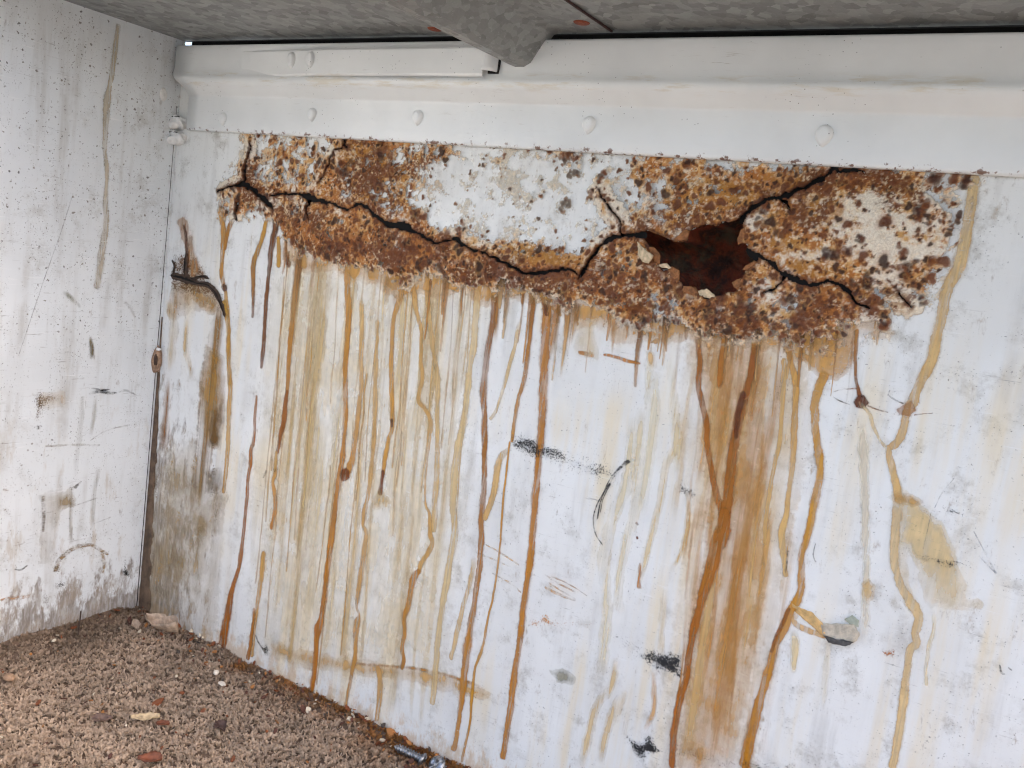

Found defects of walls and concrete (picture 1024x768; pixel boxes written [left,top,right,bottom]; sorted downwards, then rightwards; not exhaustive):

leakage [102,28,118,195]
crack [157,145,226,345]
crack [217,143,647,277]
spalling [645,219,757,299]
crack [740,167,870,309]
crack [136,373,156,606]
corrosion [169,175,980,768]